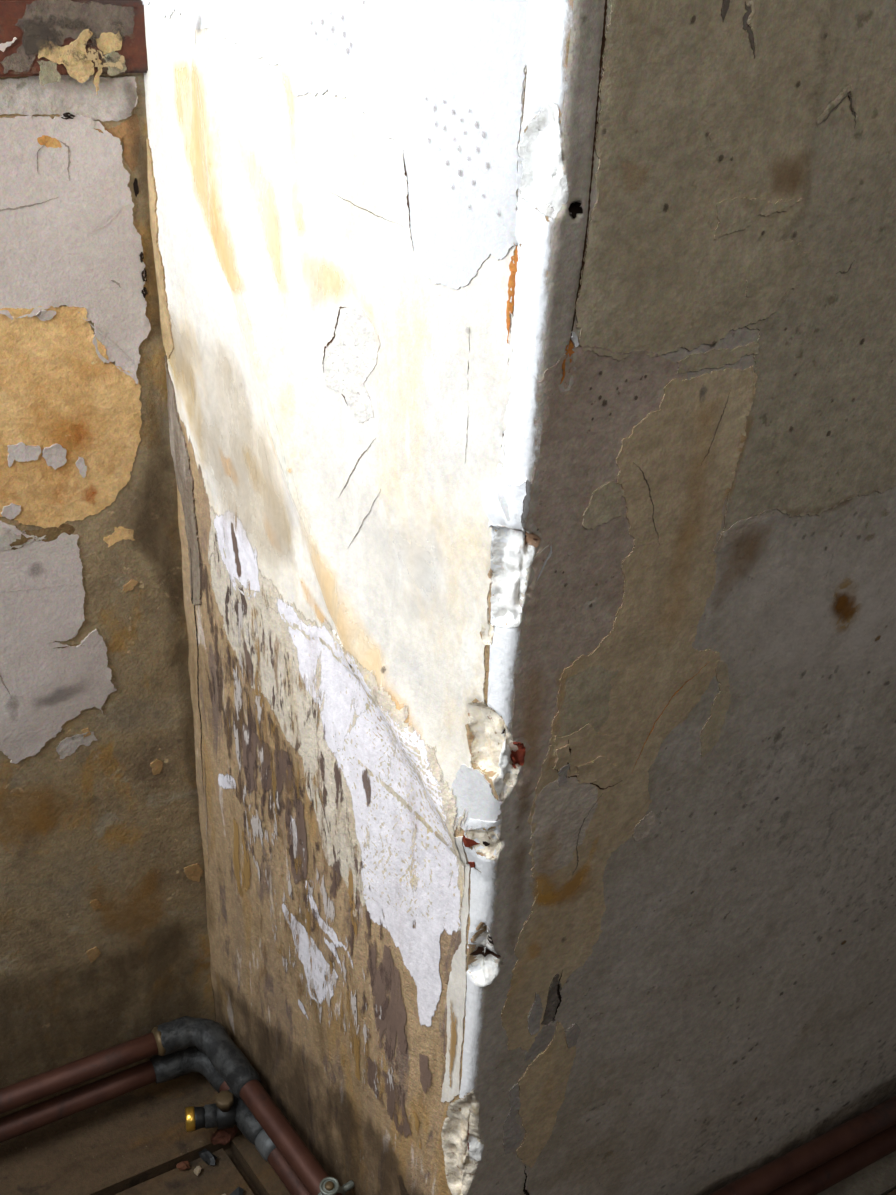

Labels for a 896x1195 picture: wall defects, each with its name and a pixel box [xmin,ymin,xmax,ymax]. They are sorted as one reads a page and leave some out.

damp [179,73,236,287]
peeling [0,0,151,764]
corrosion [832,581,857,629]
damp [200,402,431,1149]
peeling [218,774,393,1098]
damp [215,988,416,1195]
damp [449,1005,457,1088]
crack [523,1165,535,1195]